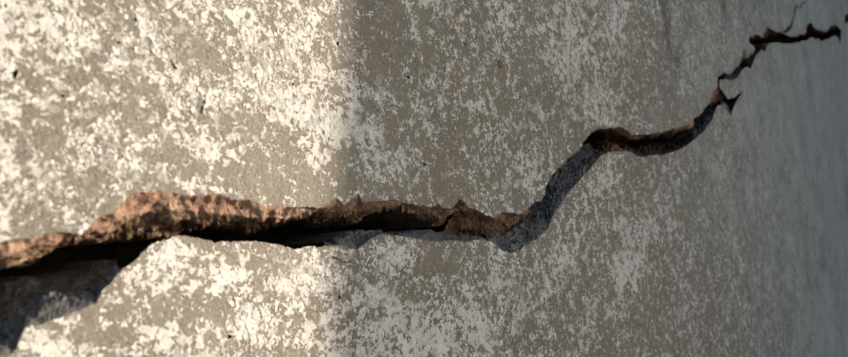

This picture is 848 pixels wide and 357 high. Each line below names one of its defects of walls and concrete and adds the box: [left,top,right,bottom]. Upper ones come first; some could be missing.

crack [443,1,842,253]
crack [0,190,483,357]